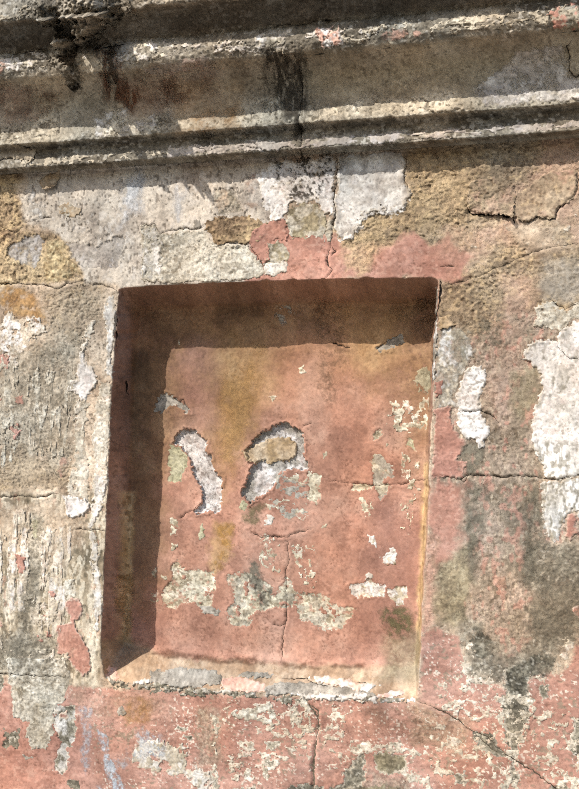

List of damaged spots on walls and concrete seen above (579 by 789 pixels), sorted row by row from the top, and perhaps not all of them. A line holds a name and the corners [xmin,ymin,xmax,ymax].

damp [97,46,140,110]
damp [263,43,307,137]
peeling [0,108,579,284]
crack [467,179,579,223]
peeling [523,301,579,543]
peeling [0,295,117,789]
spalling [150,422,408,632]
crack [253,529,336,687]
damp [469,627,493,658]
damp [507,651,555,690]
crack [307,702,320,789]
crack [420,702,557,789]